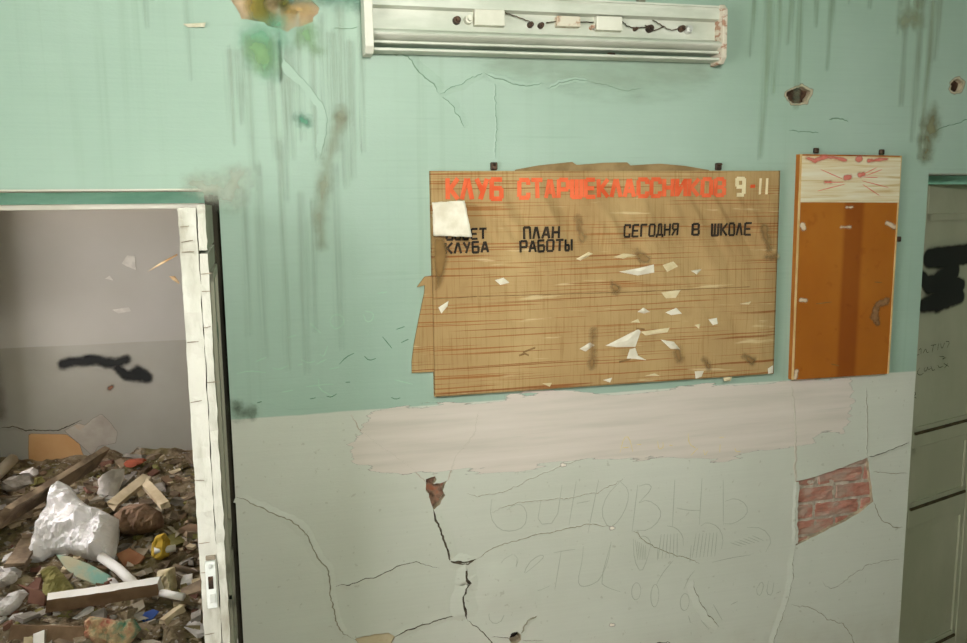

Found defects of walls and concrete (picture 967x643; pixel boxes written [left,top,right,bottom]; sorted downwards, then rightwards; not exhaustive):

flaking render [231,0,252,20]
flaking render [266,0,319,32]
spalling [784,84,813,105]
spalling [949,76,965,94]
crack [865,387,910,476]
crack [351,410,625,514]
spalling [426,476,443,507]
flaking render [796,458,870,542]
crack [769,385,903,643]
crack [234,491,724,643]
spalling [356,633,394,643]